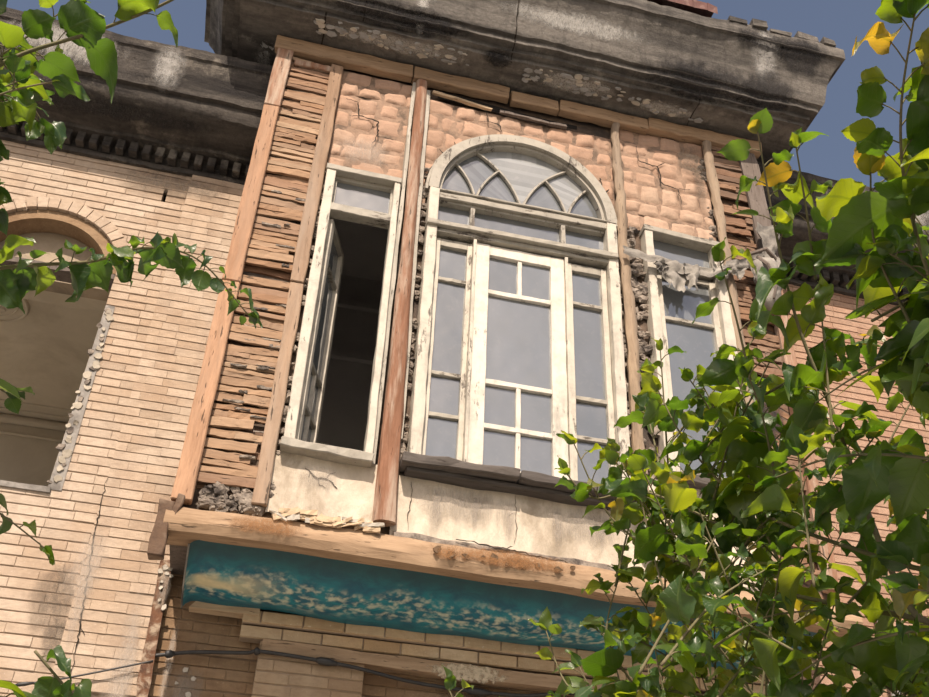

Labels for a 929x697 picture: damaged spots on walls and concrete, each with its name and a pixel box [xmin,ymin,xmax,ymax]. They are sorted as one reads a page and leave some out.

flaking render [314,18,469,66]
crack [511,0,520,63]
crack [346,98,392,143]
flaking render [522,68,703,123]
crack [636,146,690,204]
crack [305,468,337,489]
crack [456,499,577,565]
crack [71,478,108,680]